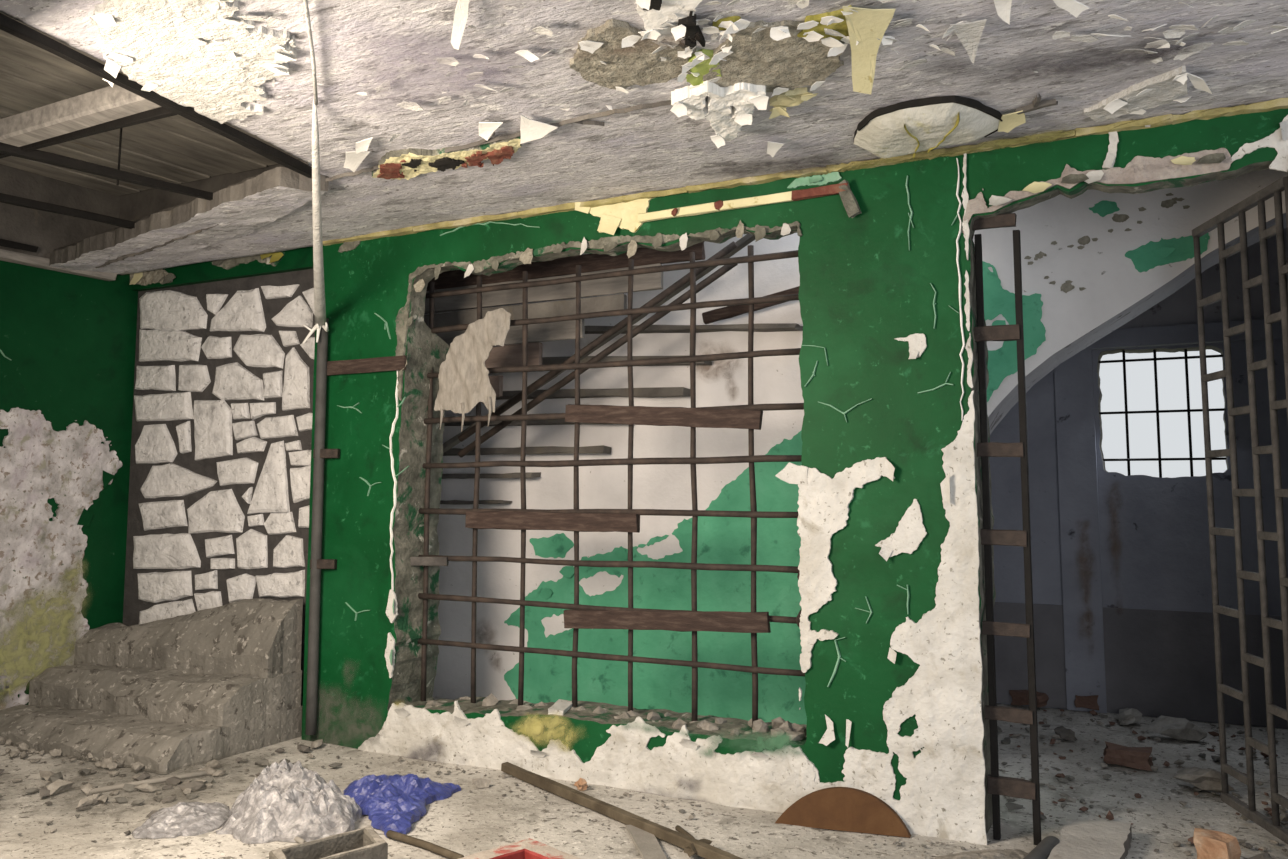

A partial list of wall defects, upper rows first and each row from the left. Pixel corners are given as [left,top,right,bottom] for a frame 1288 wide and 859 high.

flaking render [91,0,297,124]
spalling [210,251,285,270]
peeling [0,407,122,709]
peeling [344,0,1288,845]